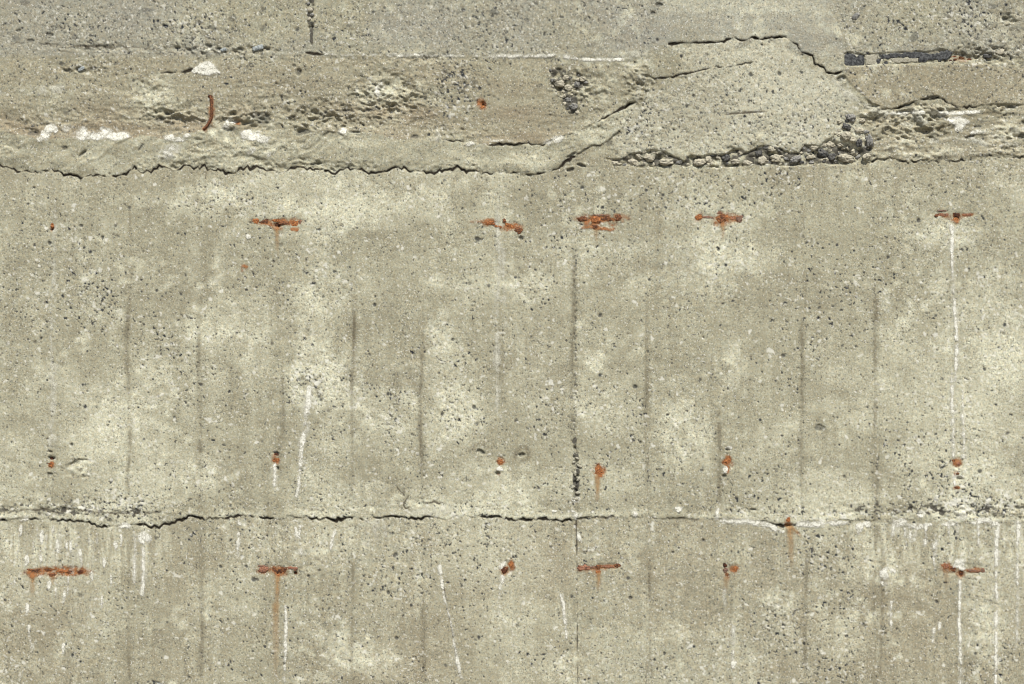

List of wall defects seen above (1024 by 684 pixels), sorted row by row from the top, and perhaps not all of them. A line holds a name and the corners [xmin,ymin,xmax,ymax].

crack [18,42,193,73]
crack [655,36,843,79]
spalling [611,31,1024,162]
crack [896,97,976,109]
crack [0,103,633,180]
crack [0,508,274,529]
crack [308,487,441,523]
crack [472,515,615,553]
corrosion [27,566,90,583]